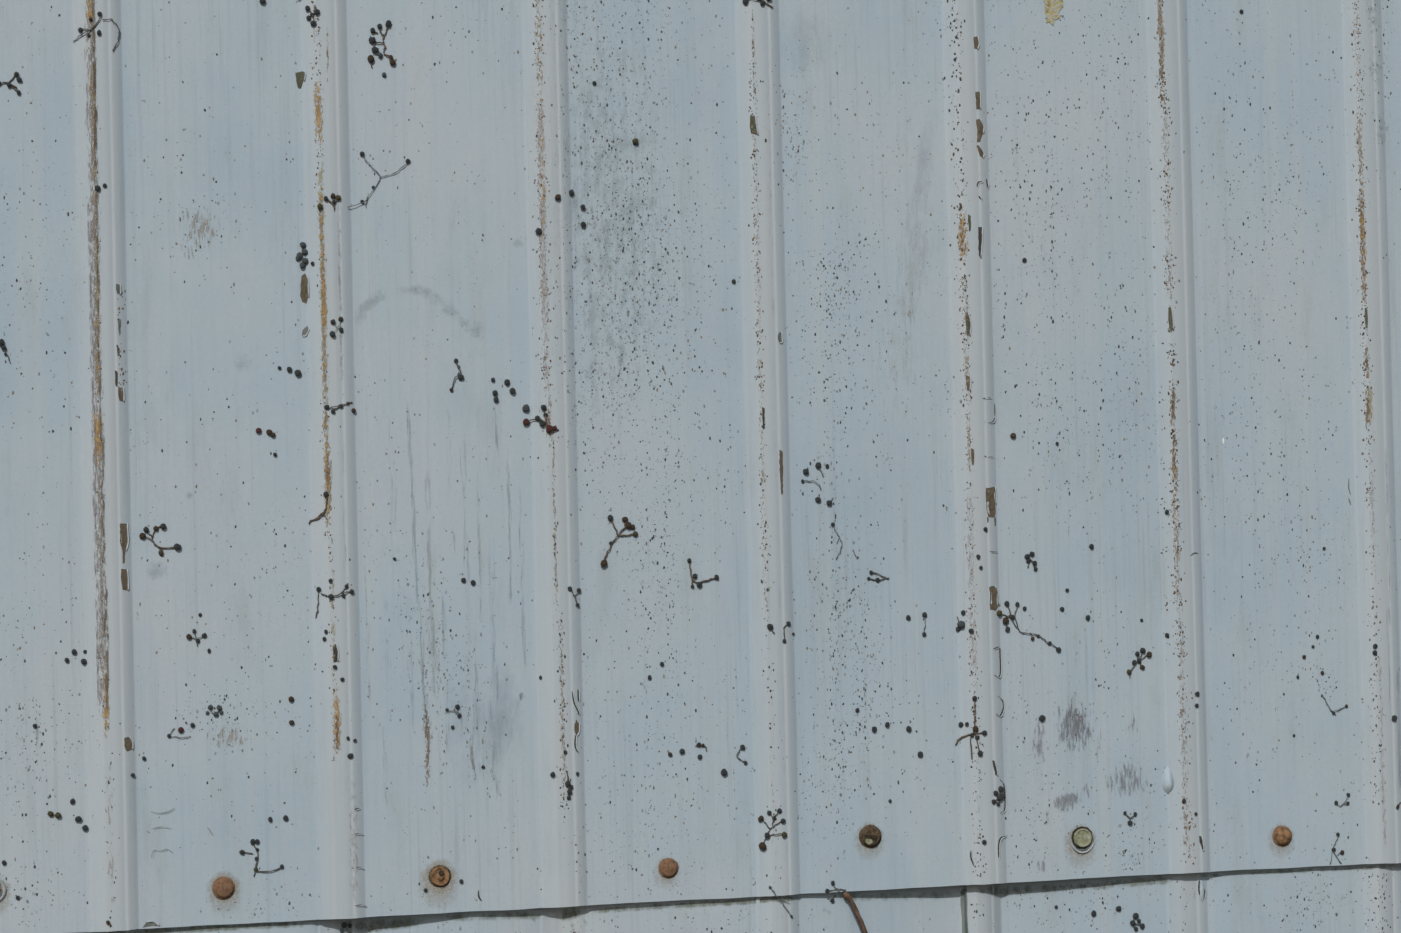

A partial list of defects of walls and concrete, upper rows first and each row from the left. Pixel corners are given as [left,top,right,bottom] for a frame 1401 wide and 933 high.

rust [83,0,129,730]
rust [310,1,341,761]
rust [1350,1,1386,805]